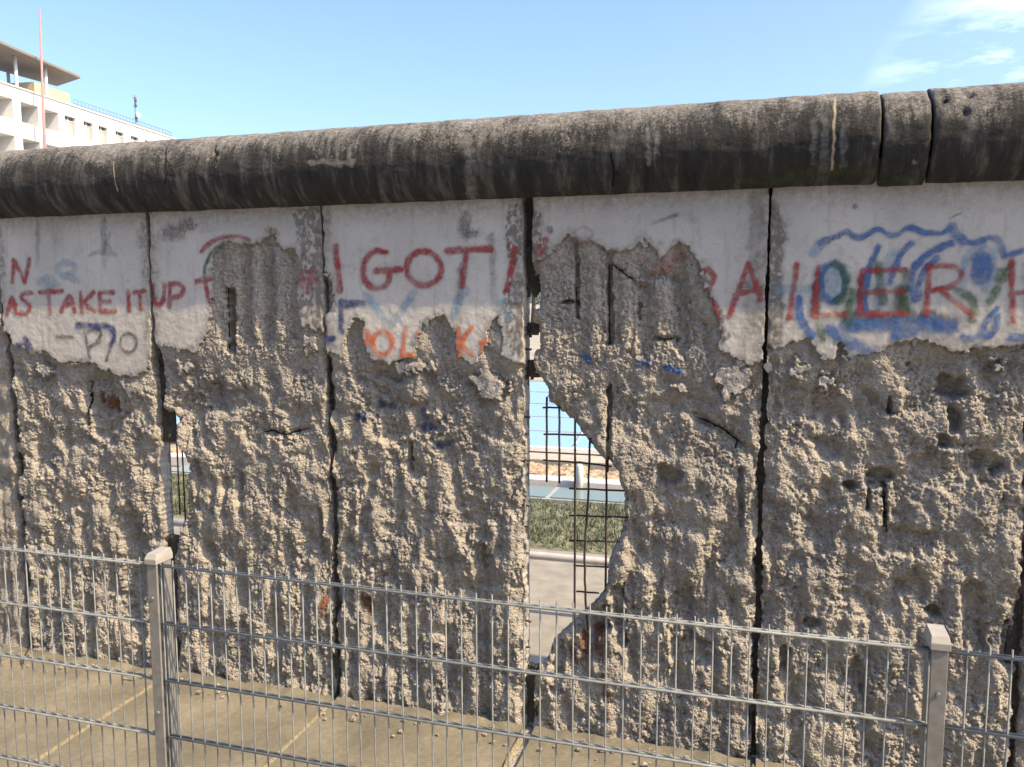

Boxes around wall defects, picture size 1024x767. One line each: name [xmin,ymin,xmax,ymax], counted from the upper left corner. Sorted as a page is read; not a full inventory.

crack [263,426,311,441]
crack [697,417,750,451]
spalling [0,201,1024,767]